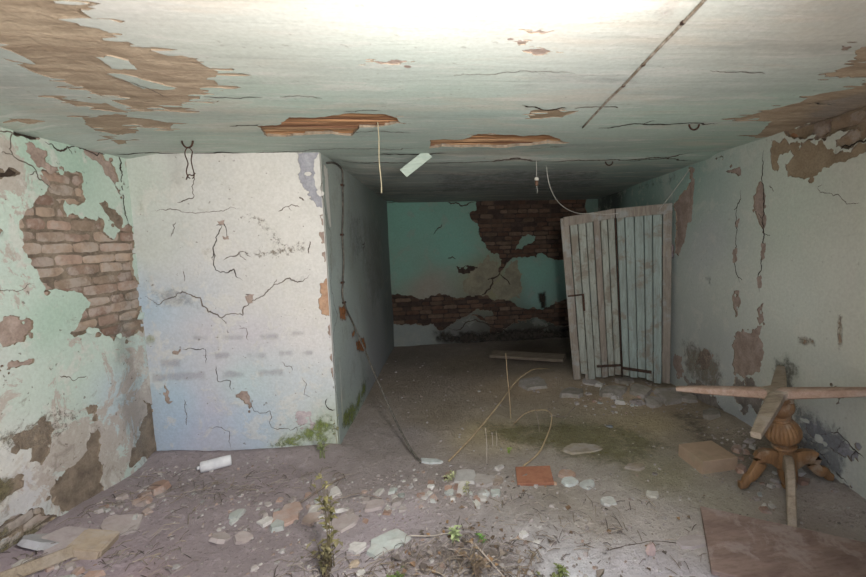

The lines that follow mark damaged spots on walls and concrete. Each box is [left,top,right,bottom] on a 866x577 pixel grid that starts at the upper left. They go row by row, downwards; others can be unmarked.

crack [0,131,54,191]
flaking render [3,119,145,339]
peeling [0,0,239,144]
crack [46,142,230,224]
crack [147,178,307,338]
crack [260,110,691,228]
flaking render [392,199,592,333]
crack [525,106,714,128]
peeling [727,46,866,183]
flaking render [0,405,102,541]
flaking render [129,403,157,468]
damp [796,409,844,473]